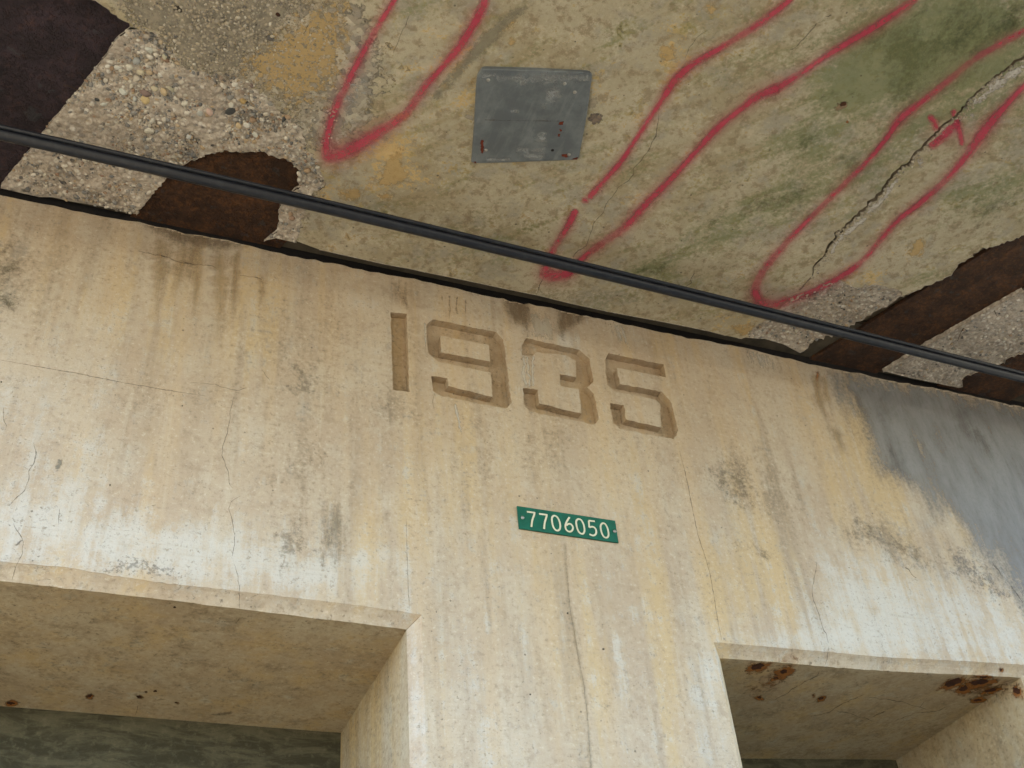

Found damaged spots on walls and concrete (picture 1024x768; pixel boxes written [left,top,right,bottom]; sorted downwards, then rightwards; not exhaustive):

spalling [42,0,358,196]
spalling [1,147,166,215]
spalling [264,204,306,243]
crack [801,56,1024,289]
spalling [322,235,1023,353]
spalling [882,288,1024,388]
corrosion [746,658,796,700]
corrosion [936,668,1023,703]